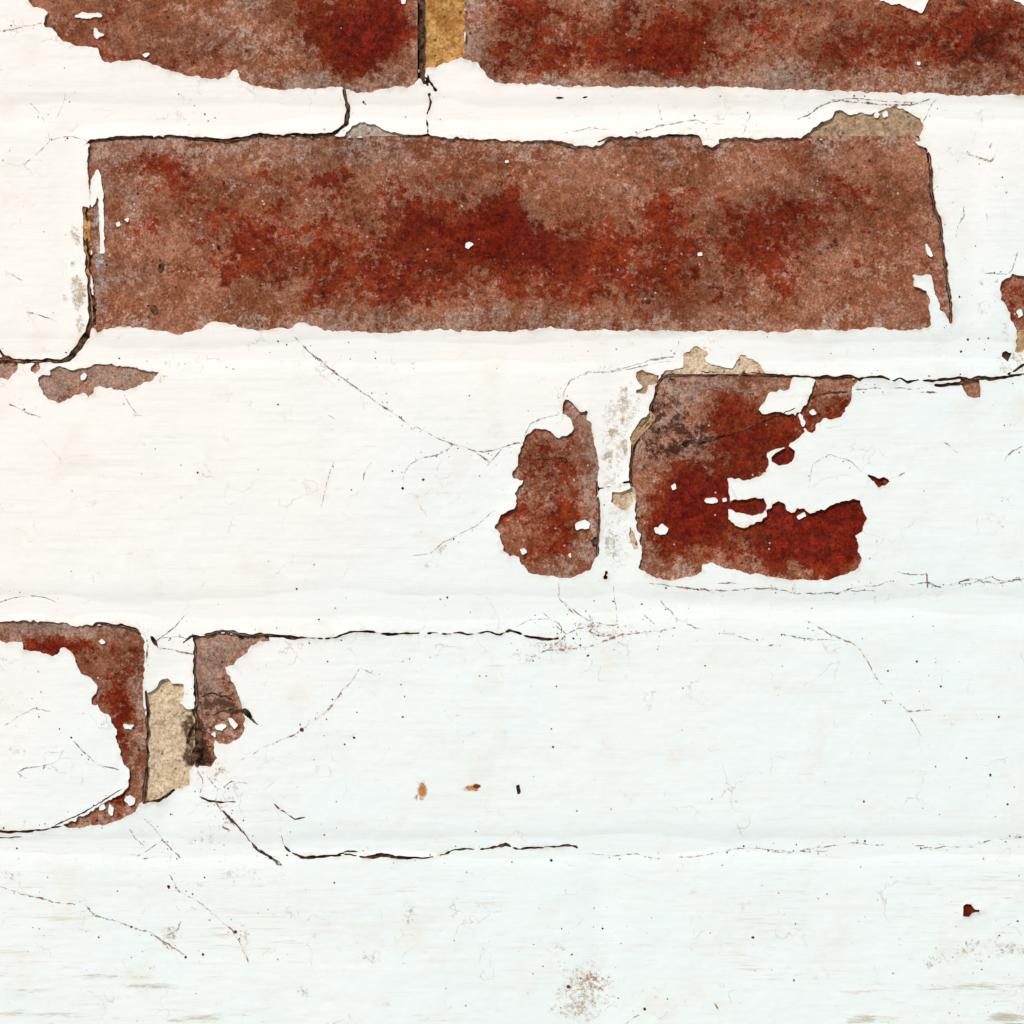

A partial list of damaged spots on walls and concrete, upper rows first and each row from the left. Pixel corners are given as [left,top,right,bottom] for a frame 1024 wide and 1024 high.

peeling [29,0,1024,97]
peeling [0,359,159,403]
crack [295,337,562,470]
peeling [83,107,952,335]
peeling [495,346,867,581]
crack [565,341,1024,556]
peeling [1000,274,1024,361]
peeling [0,620,271,828]
crack [93,571,1021,866]